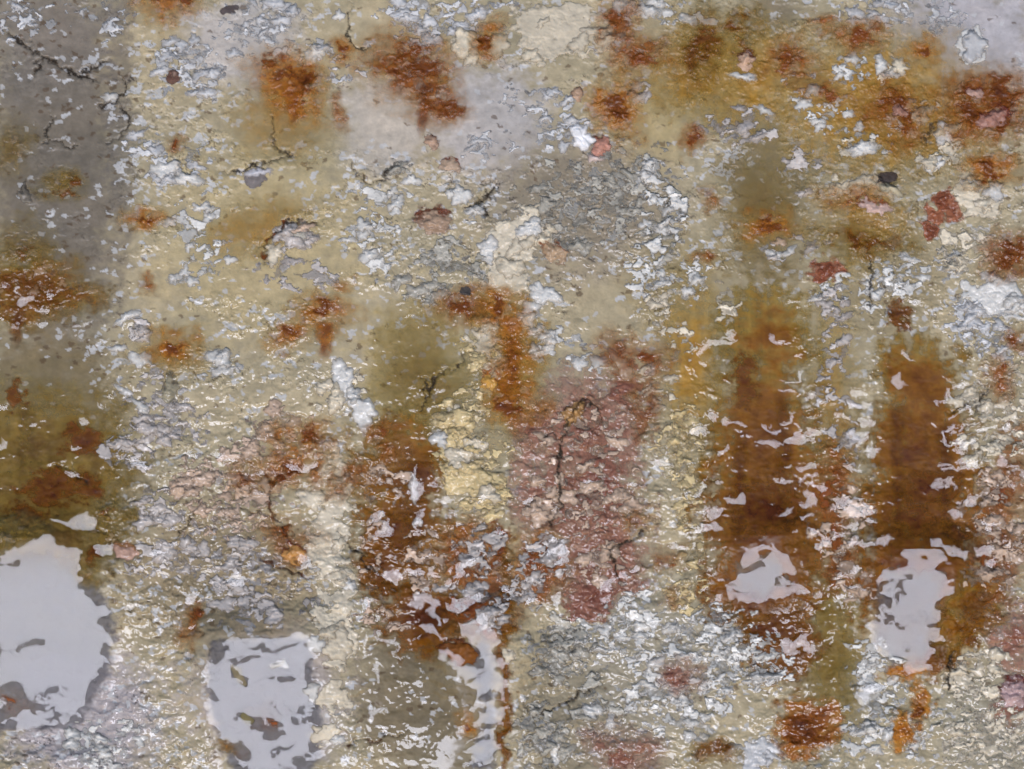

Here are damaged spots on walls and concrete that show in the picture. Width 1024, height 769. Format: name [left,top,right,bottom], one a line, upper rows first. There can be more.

crack [11,35,105,80]
crack [99,82,130,128]
rust [259,54,320,119]
rust [364,34,466,125]
peeling [629,77,652,105]
peeling [730,72,755,81]
rust [938,73,1024,185]
rust [0,235,107,338]
peeling [338,83,795,769]
peeling [96,310,419,748]
rust [236,284,663,769]
rust [684,285,1024,763]